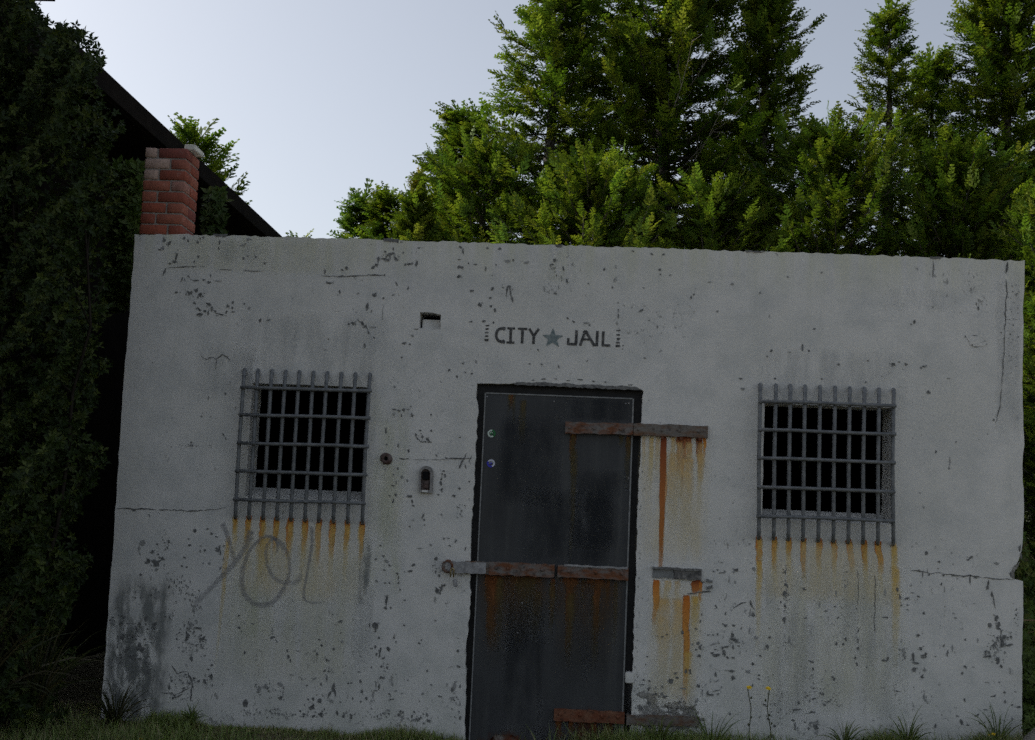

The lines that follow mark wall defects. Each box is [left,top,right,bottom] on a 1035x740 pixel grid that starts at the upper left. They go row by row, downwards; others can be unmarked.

crack [997,262,1008,416]
crack [117,505,225,513]
rust [233,516,365,555]
rust [651,437,707,553]
rust [755,536,899,593]
peeling [109,528,225,701]
rust [653,580,711,677]
peeling [881,608,1018,680]
crack [912,569,1014,645]